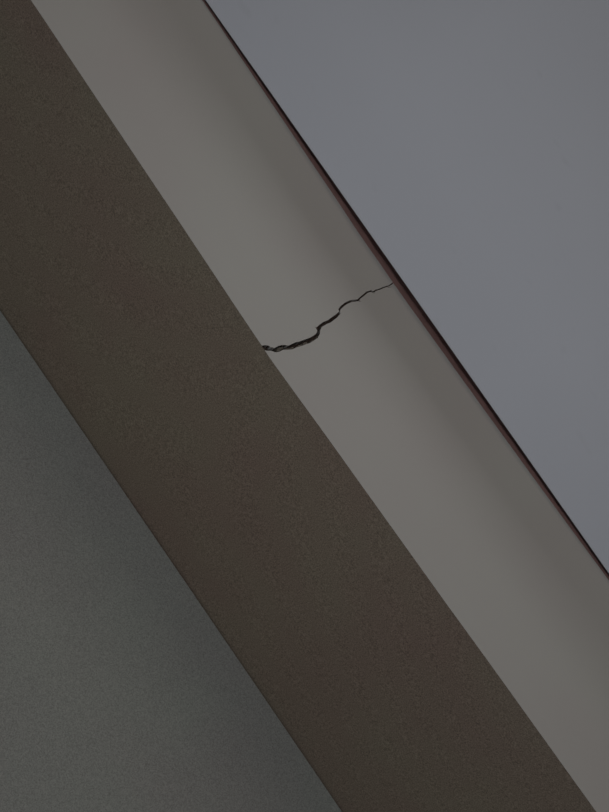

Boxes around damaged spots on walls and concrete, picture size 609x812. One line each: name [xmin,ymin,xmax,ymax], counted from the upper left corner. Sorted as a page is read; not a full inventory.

crack [262,283,392,352]